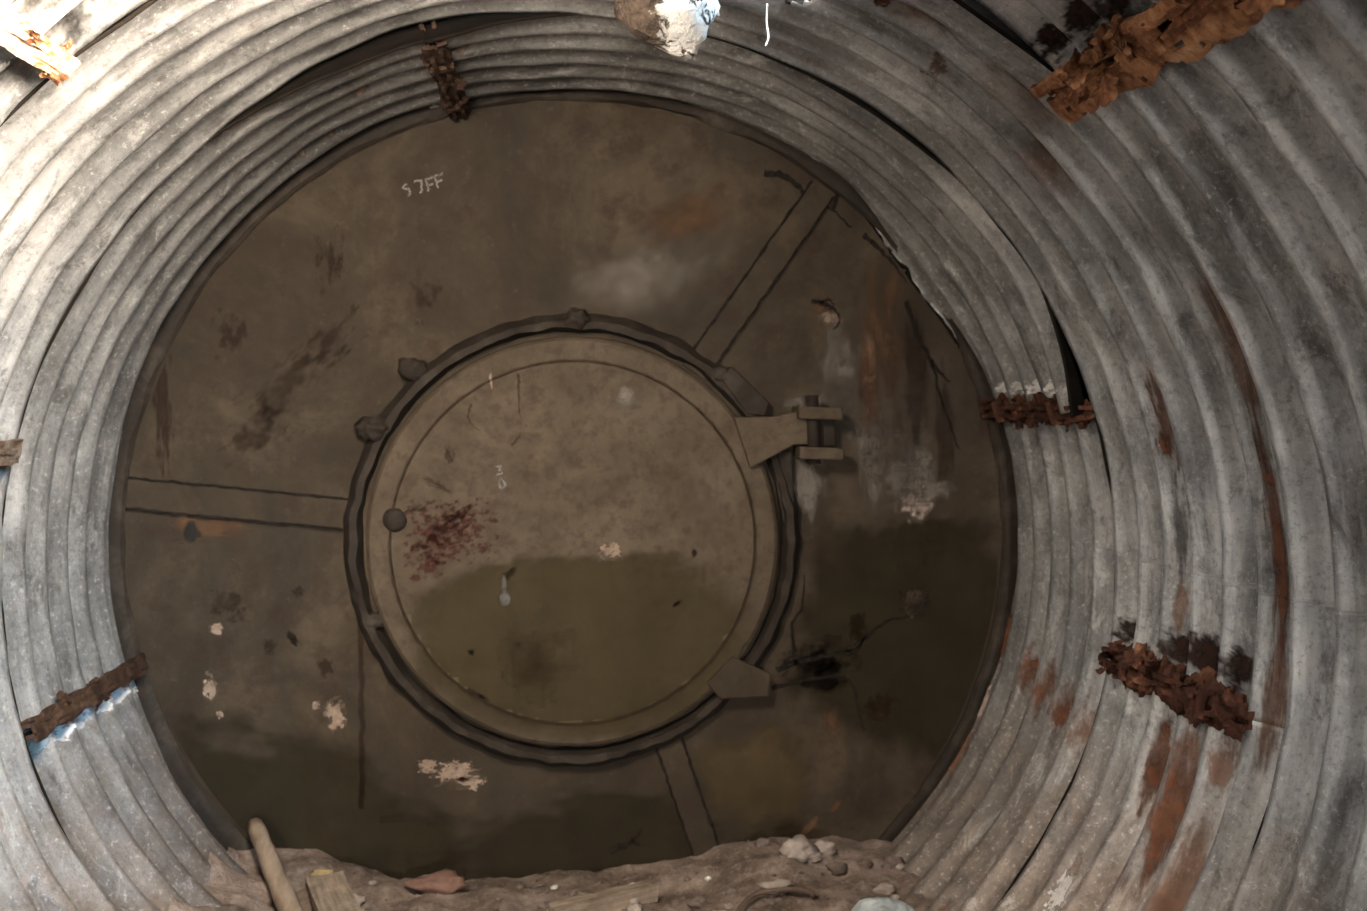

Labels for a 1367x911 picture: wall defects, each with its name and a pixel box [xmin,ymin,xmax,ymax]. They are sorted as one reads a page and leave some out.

corrosion [22,18,73,53]
corrosion [36,71,61,86]
corrosion [1021,11,1142,108]
corrosion [1234,0,1286,15]
corrosion [989,392,1093,433]
corrosion [403,483,498,582]
corrosion [1095,276,1289,911]
corrosion [949,685,992,770]